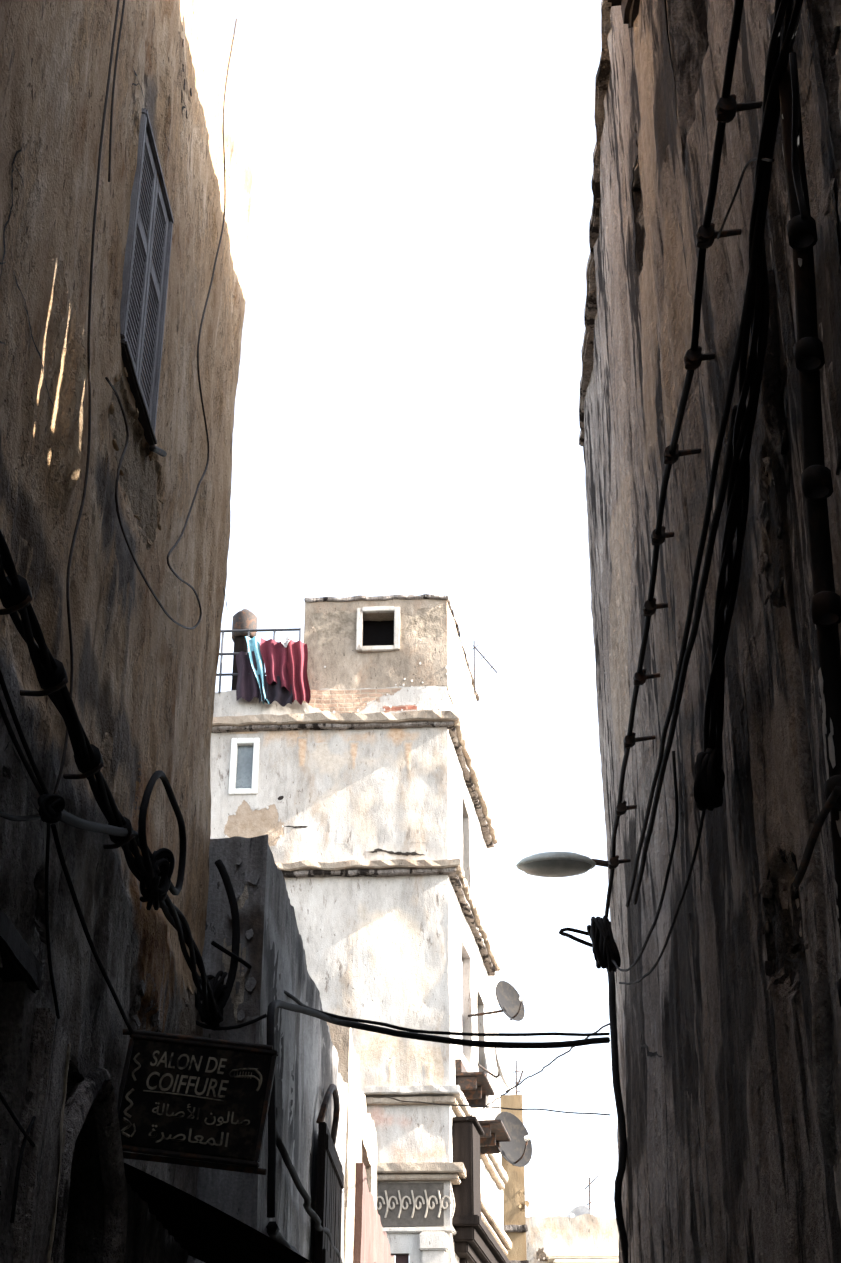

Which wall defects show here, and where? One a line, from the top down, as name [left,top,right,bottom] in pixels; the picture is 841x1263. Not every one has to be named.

leakage [756,48,769,140]
leakage [793,0,814,117]
leakage [766,111,797,364]
flaking render [219,797,294,851]